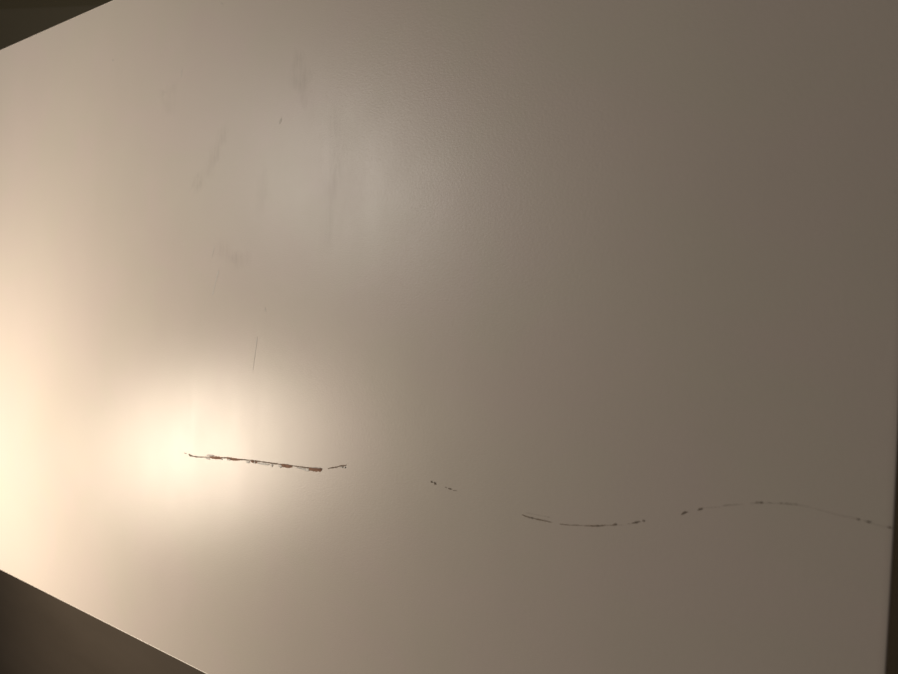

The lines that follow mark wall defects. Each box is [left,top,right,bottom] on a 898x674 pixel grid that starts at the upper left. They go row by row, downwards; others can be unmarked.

crack [185,453,346,472]
crack [522,513,645,527]